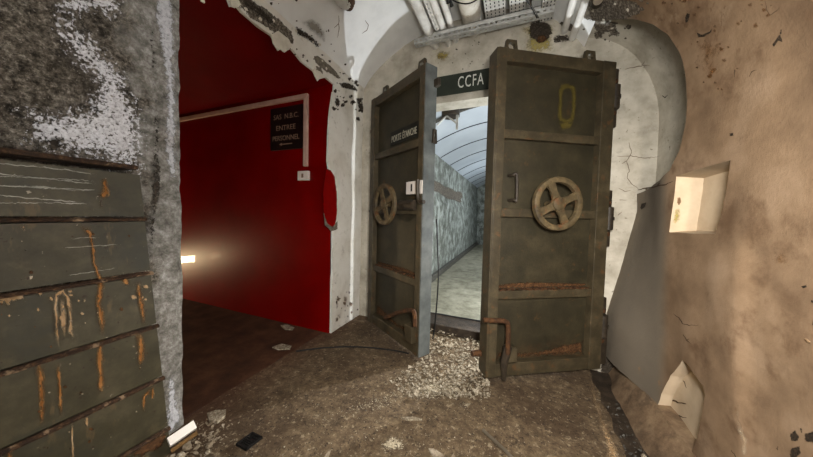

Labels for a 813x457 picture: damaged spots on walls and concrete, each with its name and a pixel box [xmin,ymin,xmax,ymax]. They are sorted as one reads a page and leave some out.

flaking render [229,0,363,121]
water stain [12,0,176,243]
crack [619,143,673,192]
rust [39,290,84,336]
rust [83,228,104,326]
rust [132,285,148,318]
rust [37,367,45,420]
rust [57,369,67,410]
water stain [167,379,179,431]